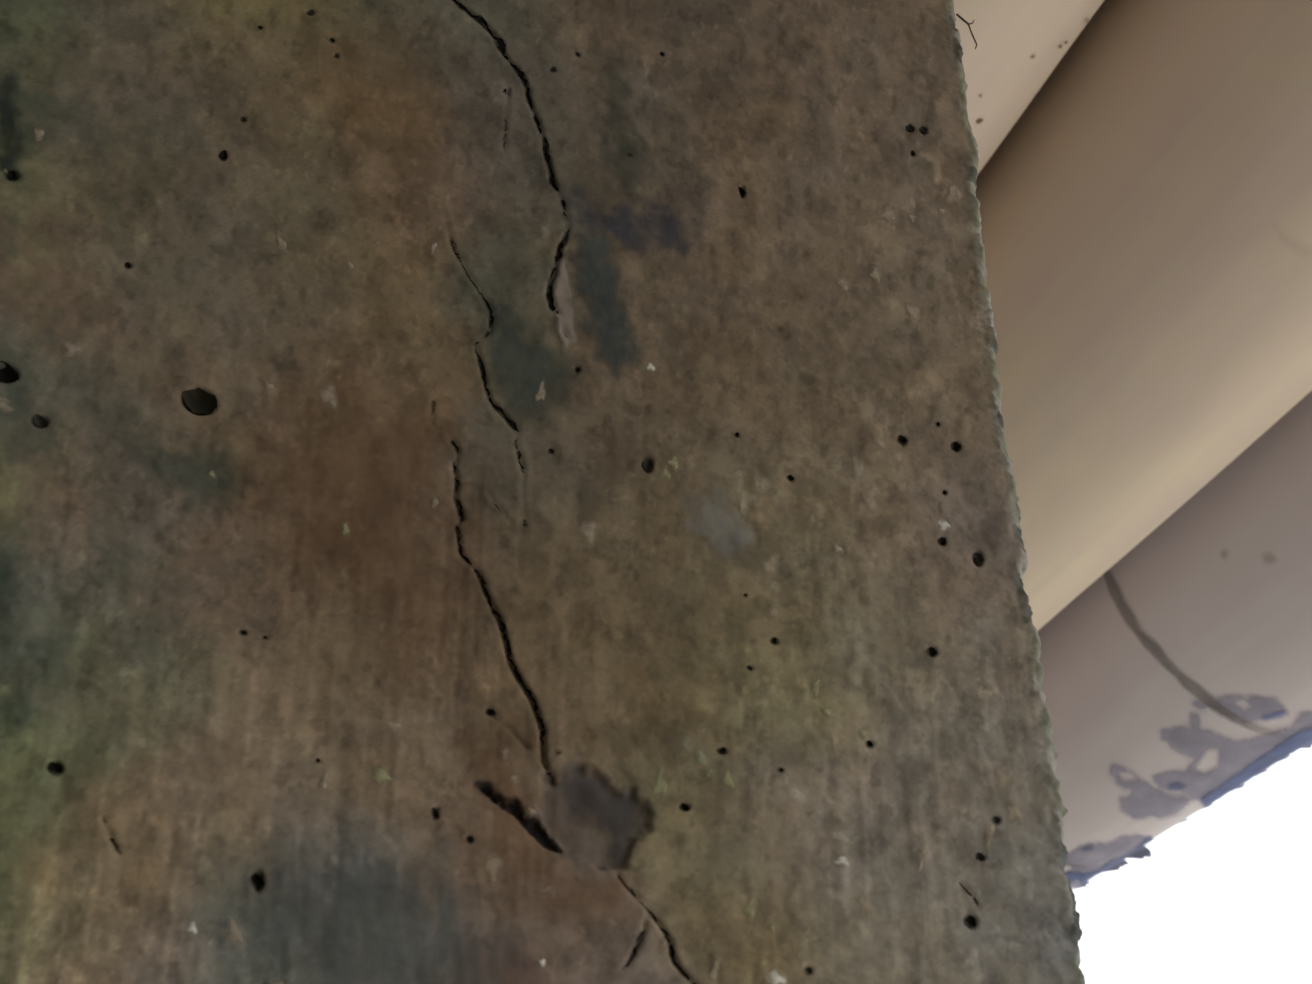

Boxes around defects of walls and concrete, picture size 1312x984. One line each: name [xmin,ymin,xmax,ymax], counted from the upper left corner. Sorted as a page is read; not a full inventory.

crack [453,0,570,337]
crack [452,241,524,473]
crack [451,440,555,781]
crack [618,875,695,984]
peeling [1065,836,1153,890]
peeling [1110,697,1312,825]